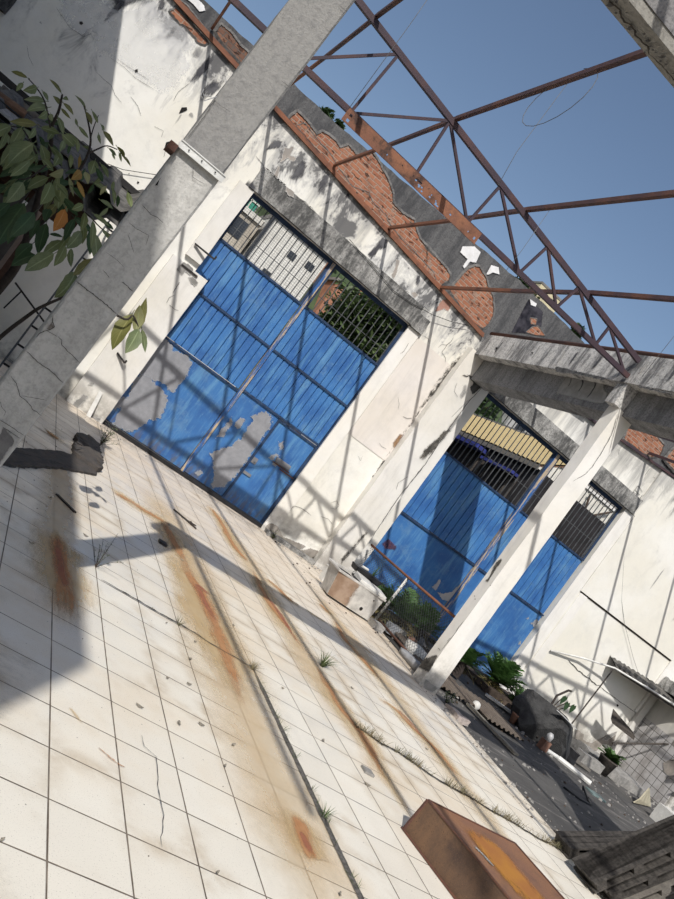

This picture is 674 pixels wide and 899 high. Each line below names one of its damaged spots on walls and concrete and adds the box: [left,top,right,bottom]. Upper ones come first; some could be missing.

leakage [105,0,141,21]
flaking render [168,0,249,64]
leakage [191,56,222,97]
leakage [291,161,307,179]
flaking render [287,109,499,331]
peeling [73,382,94,408]
peeling [112,338,192,433]
peeling [195,411,273,489]
rust [43,469,84,609]
rust [310,604,492,821]